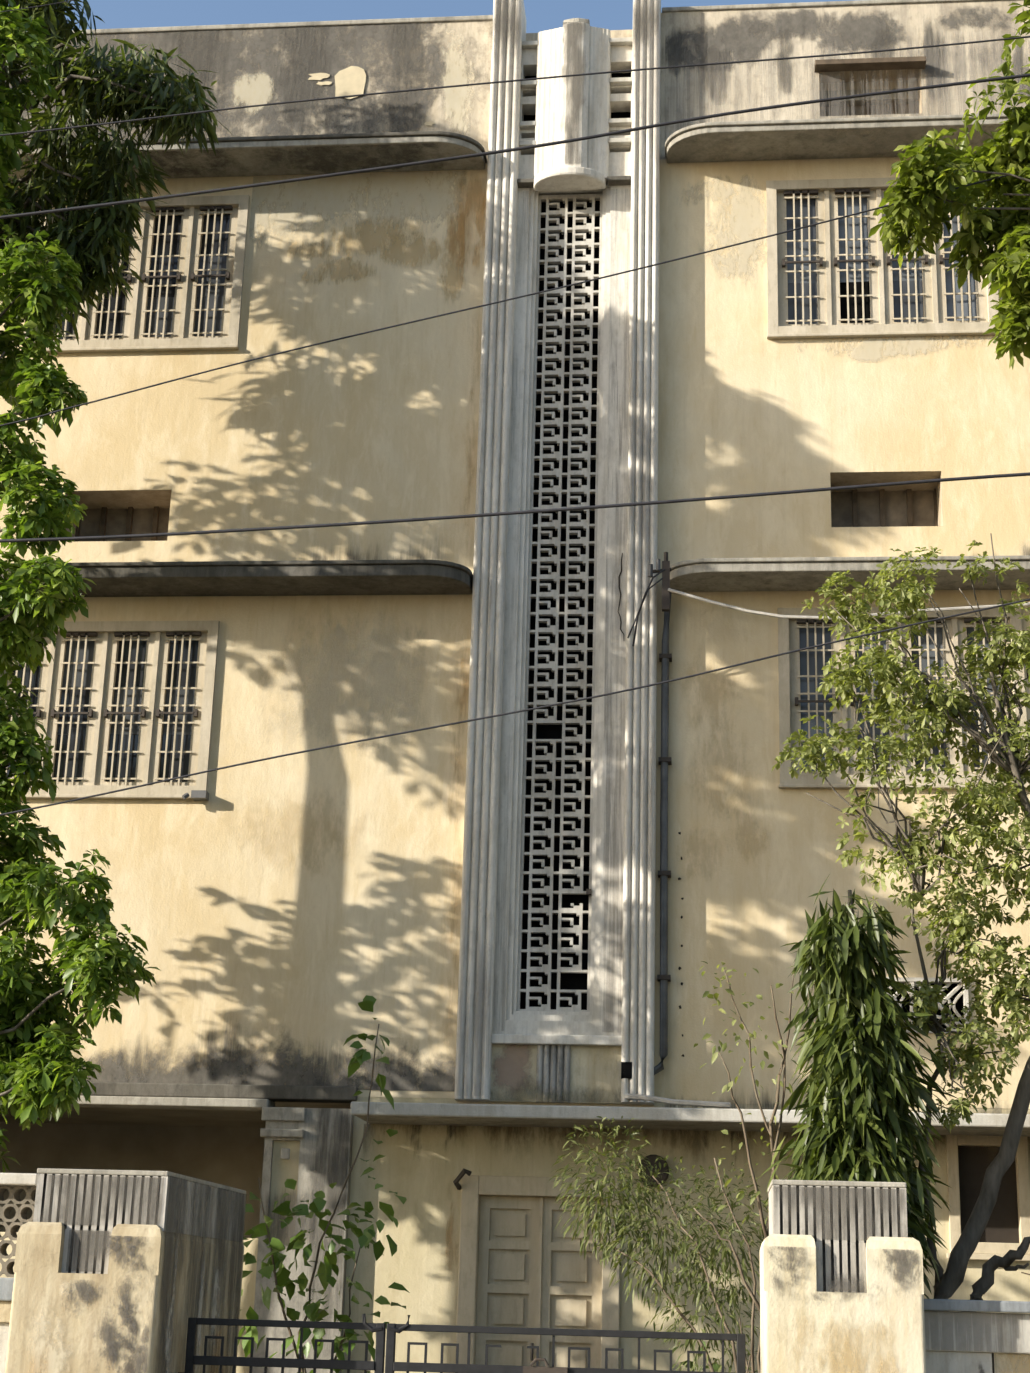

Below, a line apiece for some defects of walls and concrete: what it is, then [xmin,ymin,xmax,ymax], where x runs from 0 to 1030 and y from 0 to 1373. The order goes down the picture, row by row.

leakage [3,23,449,179]
peeling [234,73,272,112]
peeling [308,66,366,100]
leakage [633,5,904,101]
leakage [923,8,1008,97]
leakage [83,1029,456,1092]
leakage [265,1108,370,1322]
leakage [774,1186,903,1240]
leakage [42,1175,247,1373]
leakage [769,1246,802,1285]
leakage [816,1279,864,1298]
leakage [883,1249,919,1284]